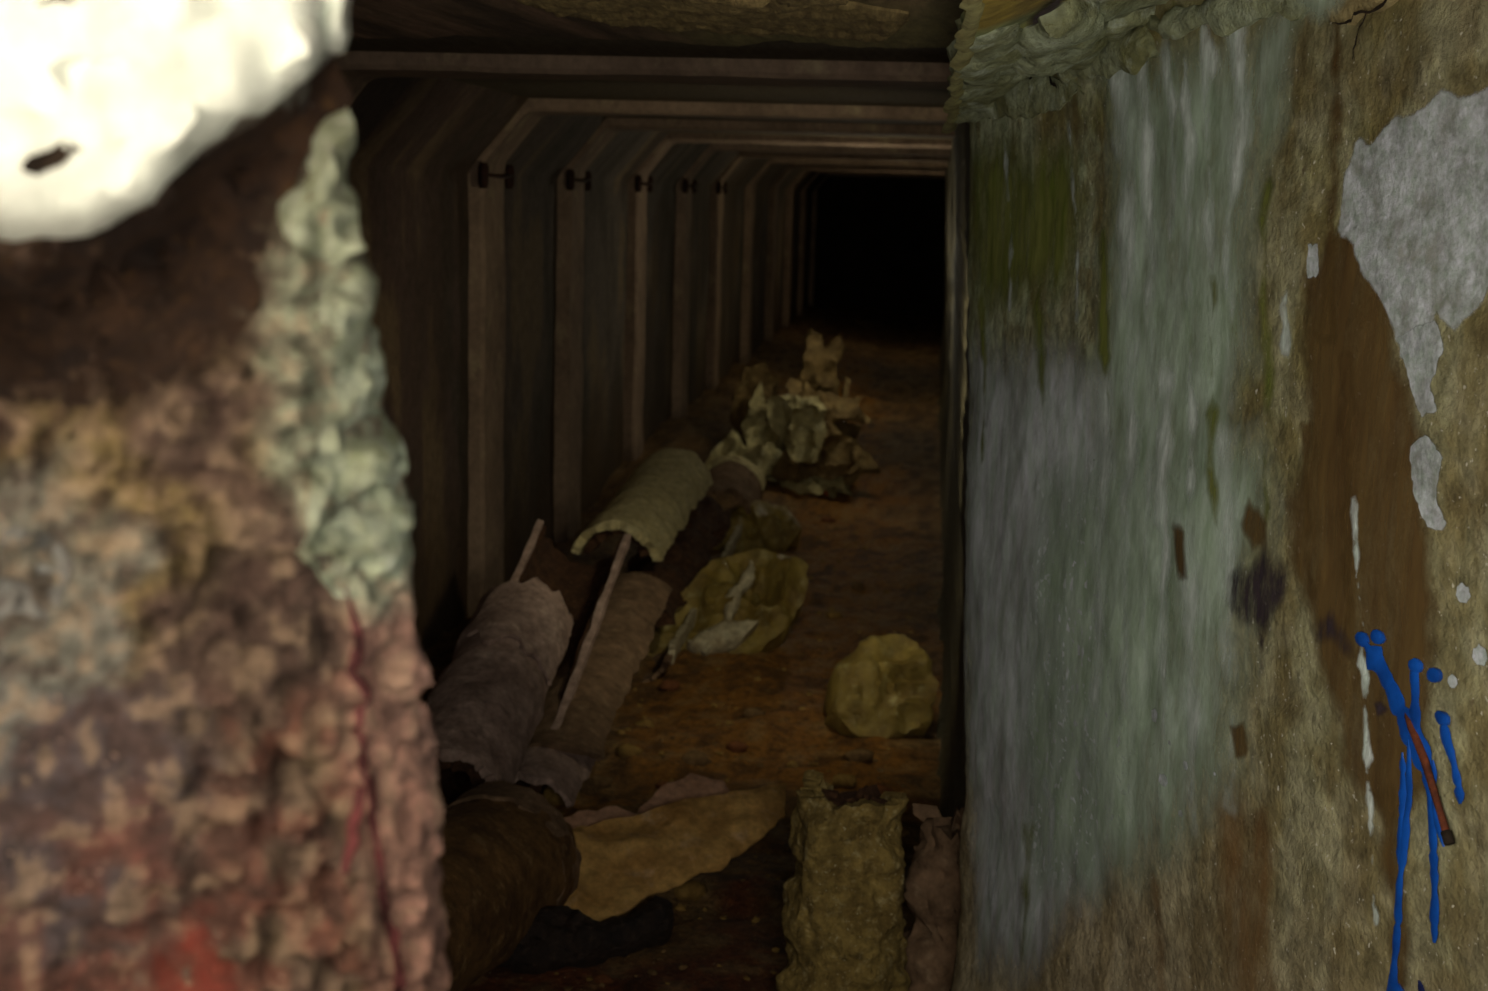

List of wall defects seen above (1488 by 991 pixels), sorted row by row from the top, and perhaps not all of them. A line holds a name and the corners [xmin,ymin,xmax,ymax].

peeling [517,0,910,43]
spalling [941,0,985,134]
crack [1333,0,1387,60]
water stain [965,26,1290,963]
crack [340,587,406,991]